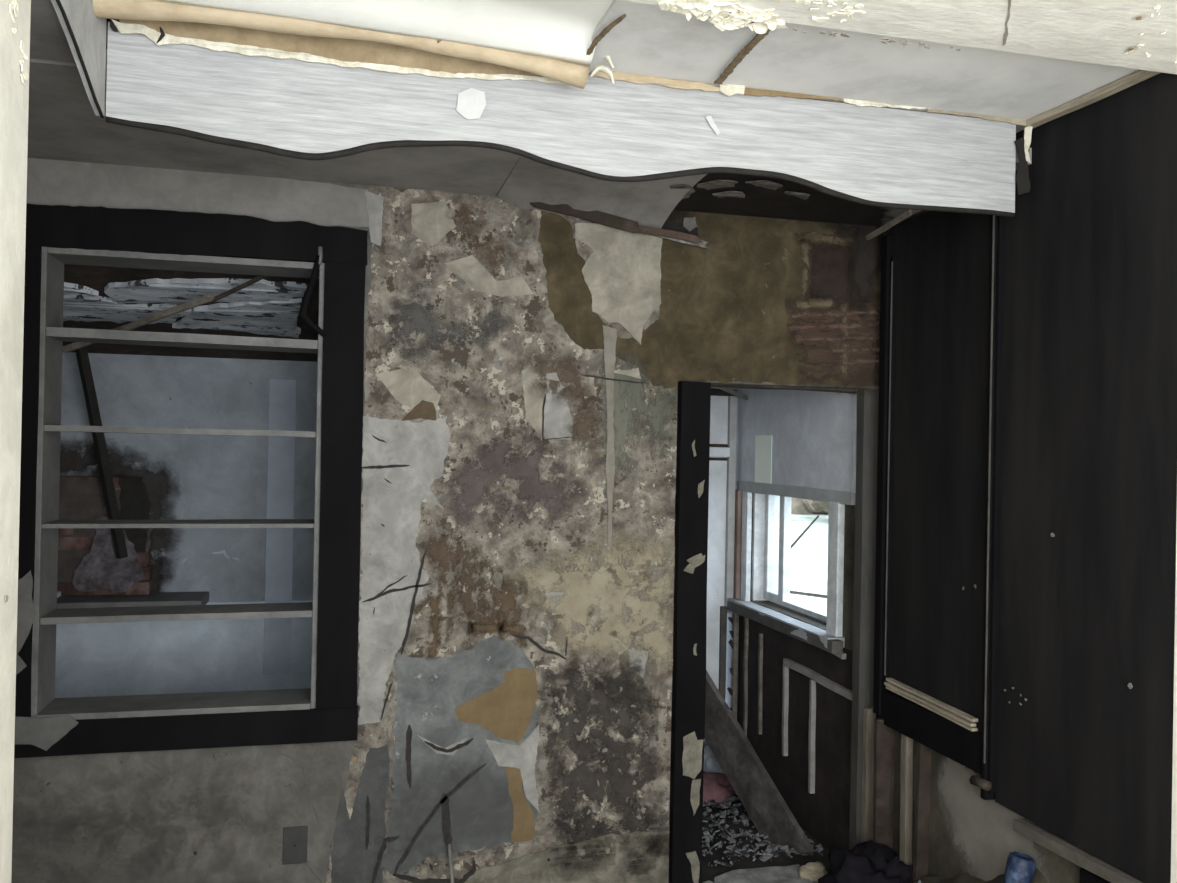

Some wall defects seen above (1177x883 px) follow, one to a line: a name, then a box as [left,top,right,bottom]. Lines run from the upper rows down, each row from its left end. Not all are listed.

peeling [658,0,866,37]
crack [1003,0,1011,46]
flaking render [538,211,881,389]
water stain [450,425,571,528]
crack [363,548,432,655]
flaking render [331,400,670,883]
peeling [683,553,705,574]
water stain [514,534,675,872]
crack [365,682,486,883]
peeling [682,731,703,816]
peeling [685,851,700,883]